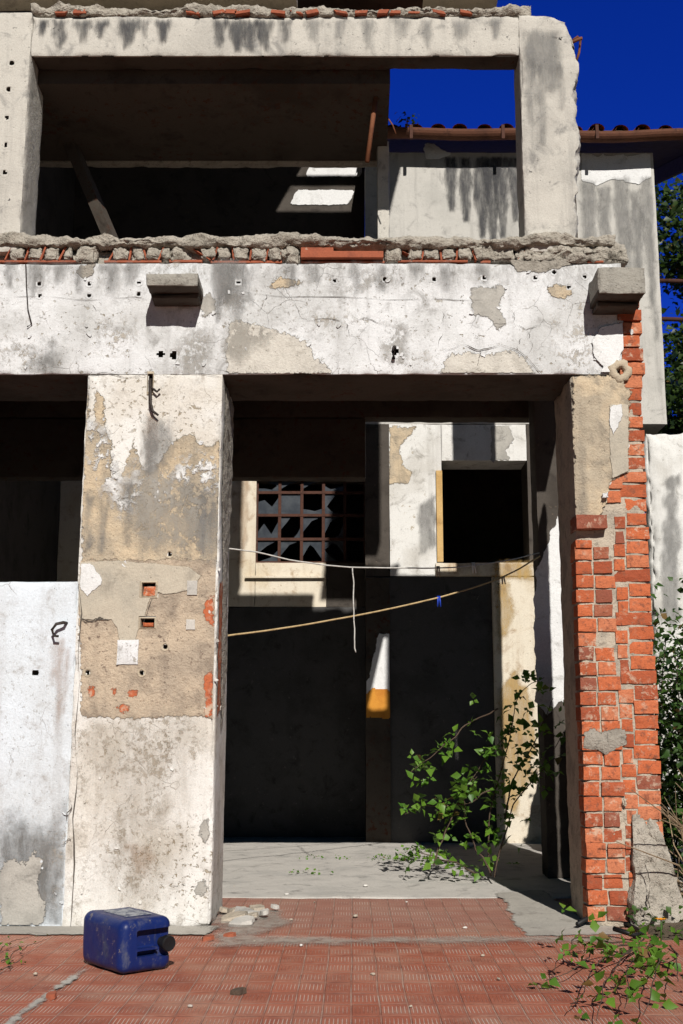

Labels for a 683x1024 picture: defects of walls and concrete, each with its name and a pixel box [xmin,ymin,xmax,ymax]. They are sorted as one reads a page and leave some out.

damp [76,21,139,46]
damp [216,21,272,50]
rust [365,96,396,163]
damp [446,158,519,239]
flaking render [224,319,332,373]
crack [234,289,402,336]
crack [438,297,551,373]
spalling [480,241,629,312]
flaking render [571,374,632,515]
flaking render [77,388,234,729]
damp [2,827,59,905]
flaking render [0,849,63,926]